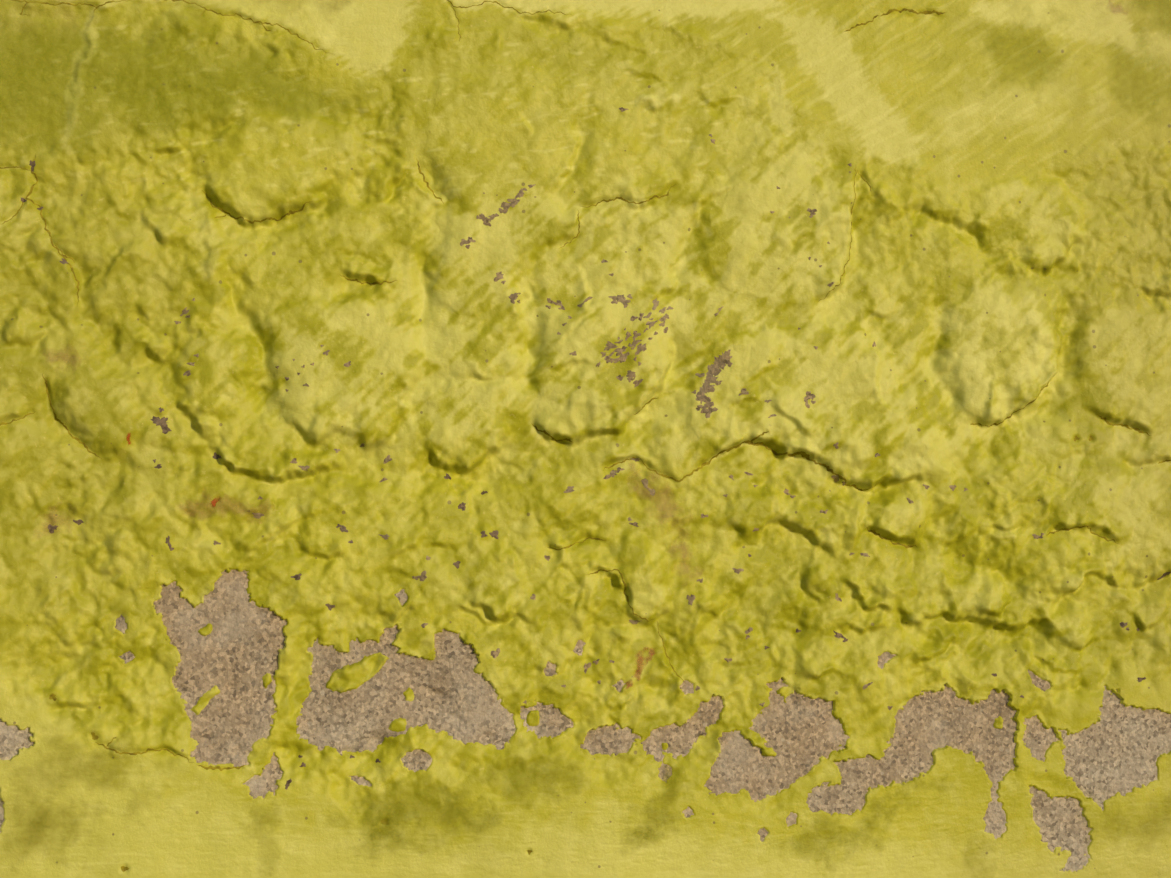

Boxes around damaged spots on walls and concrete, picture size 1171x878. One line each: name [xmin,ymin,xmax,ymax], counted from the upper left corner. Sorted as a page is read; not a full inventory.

crack [0,154,80,307]
crack [603,431,882,491]
peeling [394,556,431,606]
peeling [153,569,292,799]
peeling [296,623,574,767]
peeling [573,640,626,692]
peeling [877,652,897,669]
peeling [0,719,34,760]
peeling [349,776,372,787]
peeling [401,749,432,772]
peeling [580,670,1171,872]